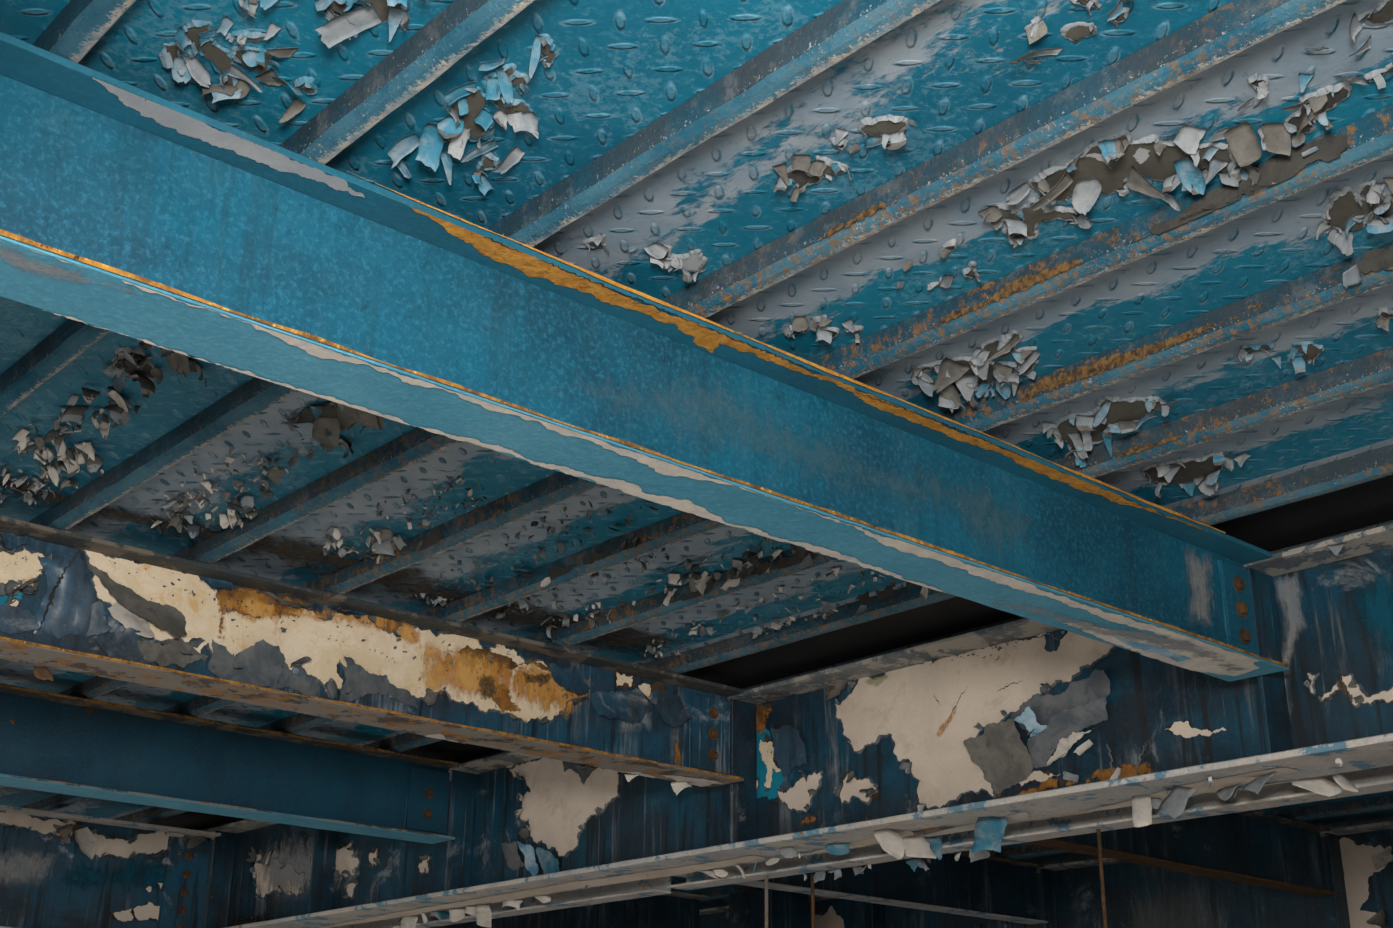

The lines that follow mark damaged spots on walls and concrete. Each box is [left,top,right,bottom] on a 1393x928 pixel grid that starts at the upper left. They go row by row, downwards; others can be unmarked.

peeling [92,77,365,198]
peeling [159,0,318,123]
peeling [315,0,409,48]
peeling [388,34,560,196]
peeling [978,61,1393,248]
corrosion [347,171,1226,533]
corrosion [0,229,1288,667]
peeling [0,280,1260,813]
corrosion [0,636,741,779]
corrosion [201,580,583,714]
peeling [80,549,1361,928]
peeling [1339,837,1393,928]